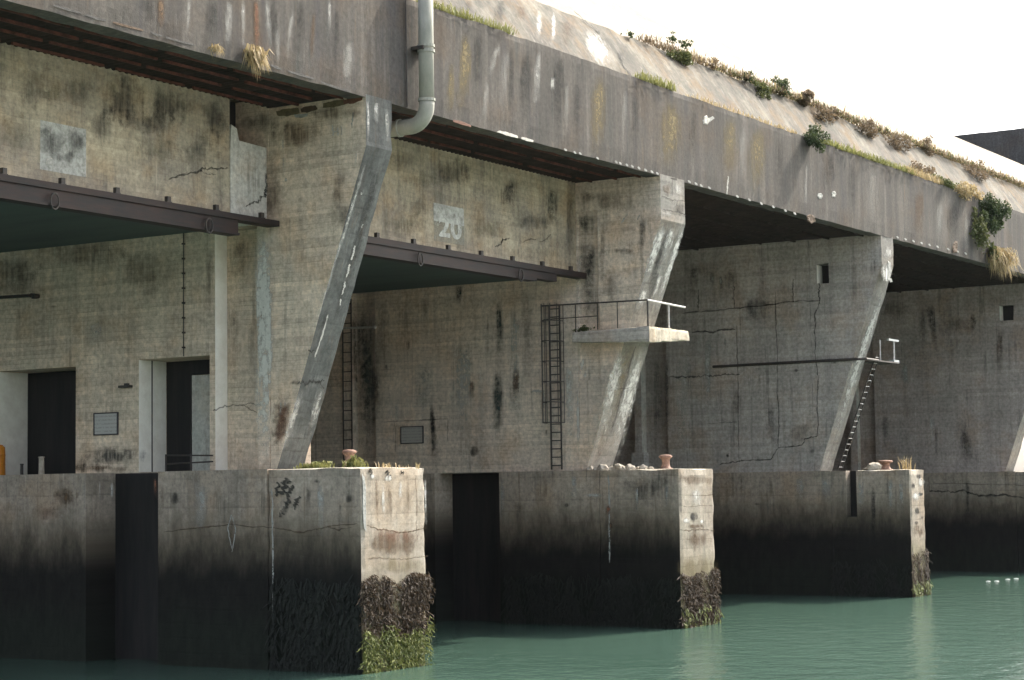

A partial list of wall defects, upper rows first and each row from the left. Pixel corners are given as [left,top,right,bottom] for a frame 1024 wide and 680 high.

crack [168,167,228,180]
crack [246,174,267,207]
crack [670,280,820,465]
crack [213,403,261,413]
rust [272,405,287,440]
leakage [494,378,517,425]
crack [929,487,1023,511]
crack [166,488,428,607]